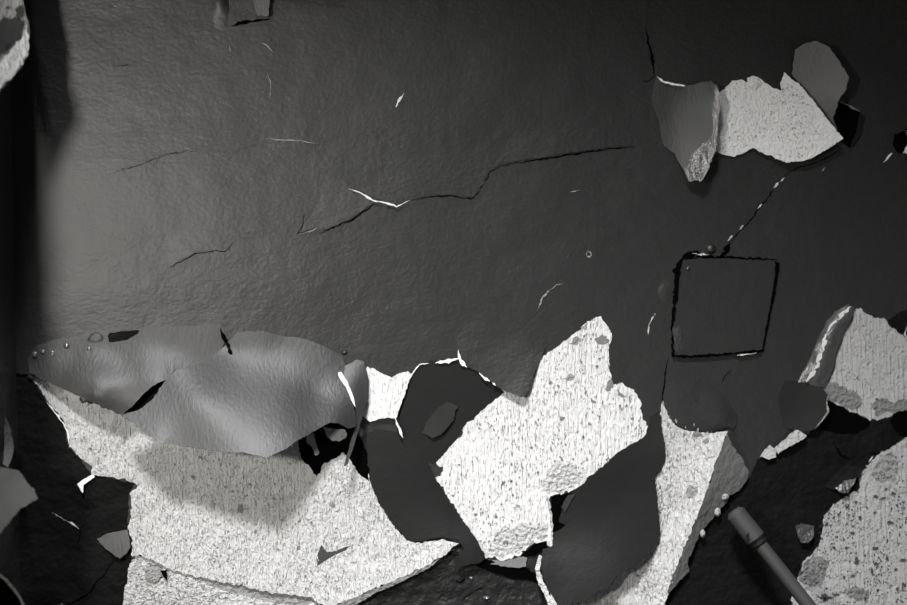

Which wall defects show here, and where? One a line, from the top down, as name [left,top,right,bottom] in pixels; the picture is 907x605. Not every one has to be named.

peeling [0,0,30,91]
crack [297,205,372,234]
crack [416,147,626,200]
crack [662,149,840,402]
spalling [716,72,860,163]
spalling [893,128,907,153]
spalling [821,308,907,434]
spalling [32,367,459,605]
spalling [436,316,648,582]
spalling [564,402,749,605]
spalling [797,437,907,605]